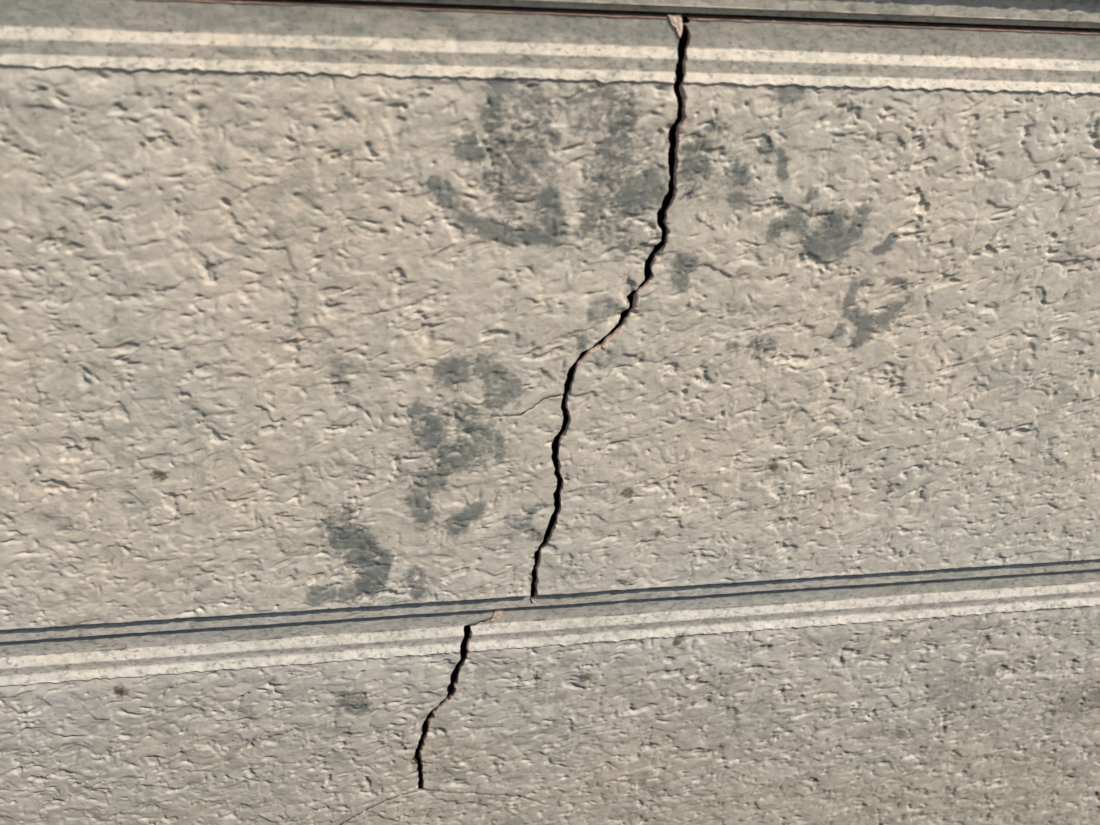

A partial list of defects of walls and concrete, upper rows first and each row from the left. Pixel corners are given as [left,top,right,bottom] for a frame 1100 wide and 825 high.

crack [491,15,691,596]
crack [340,617,547,825]